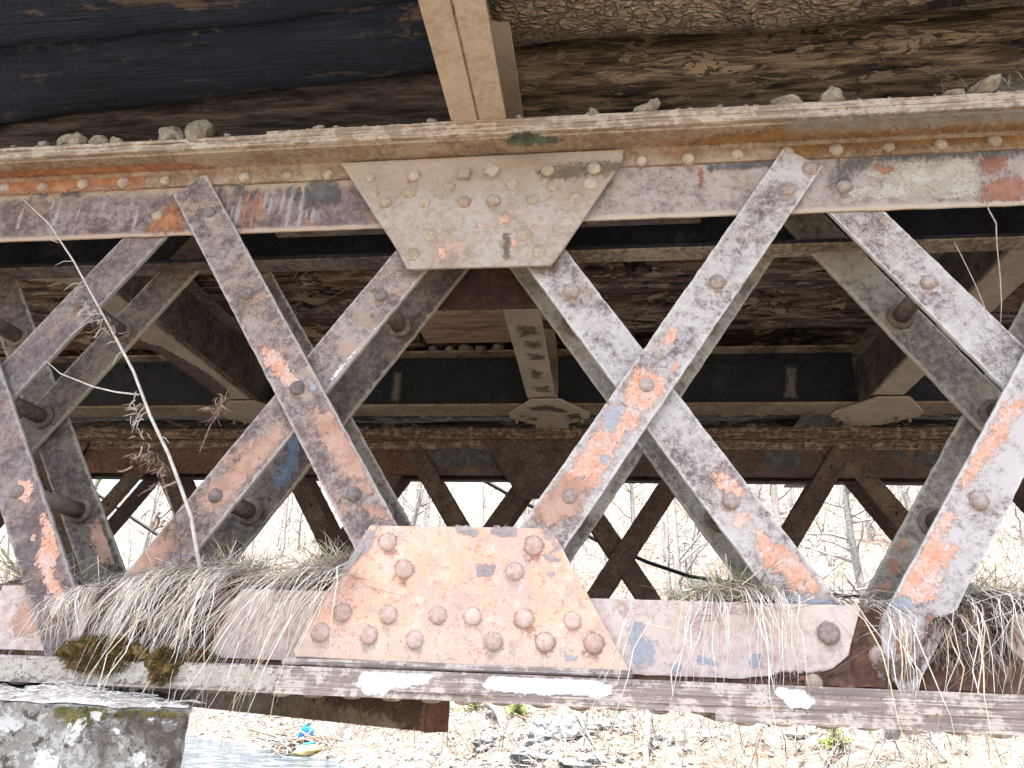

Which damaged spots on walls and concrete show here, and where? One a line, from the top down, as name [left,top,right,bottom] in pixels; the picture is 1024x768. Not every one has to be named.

rust [0,163,216,197]
rust [675,111,1024,203]
rust [142,201,185,235]
peeling [628,621,658,668]